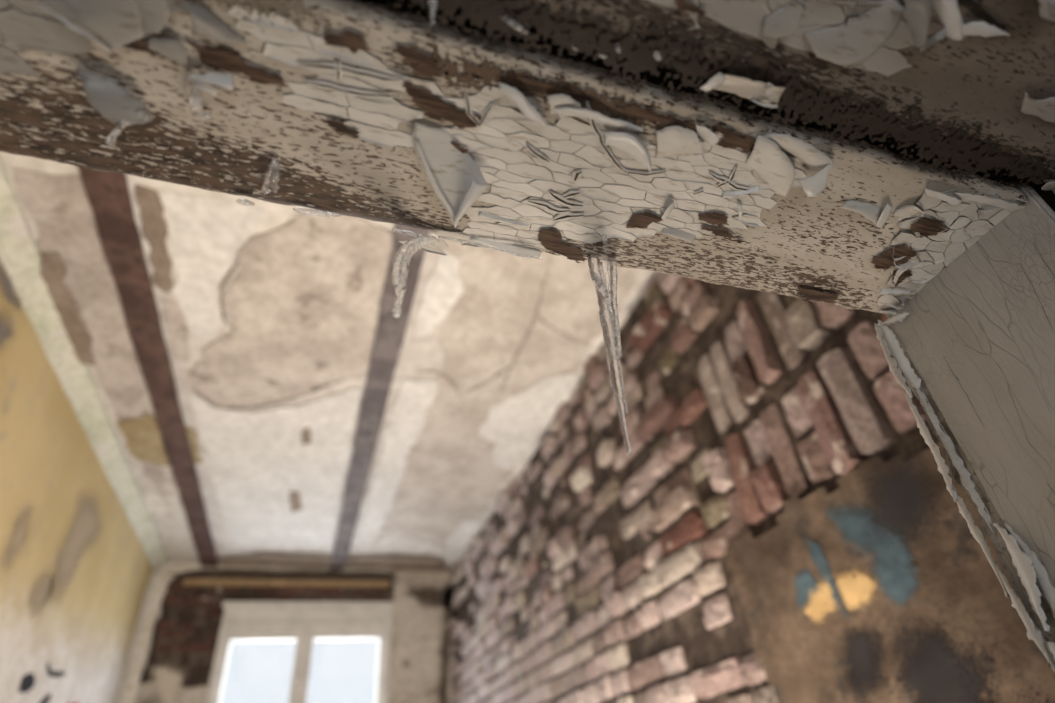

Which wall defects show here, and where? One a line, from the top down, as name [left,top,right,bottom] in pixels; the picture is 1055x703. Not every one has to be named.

peeling [648,0,1010,76]
peeling [1020,92,1055,123]
peeling [0,0,838,578]
crack [1020,243,1055,331]